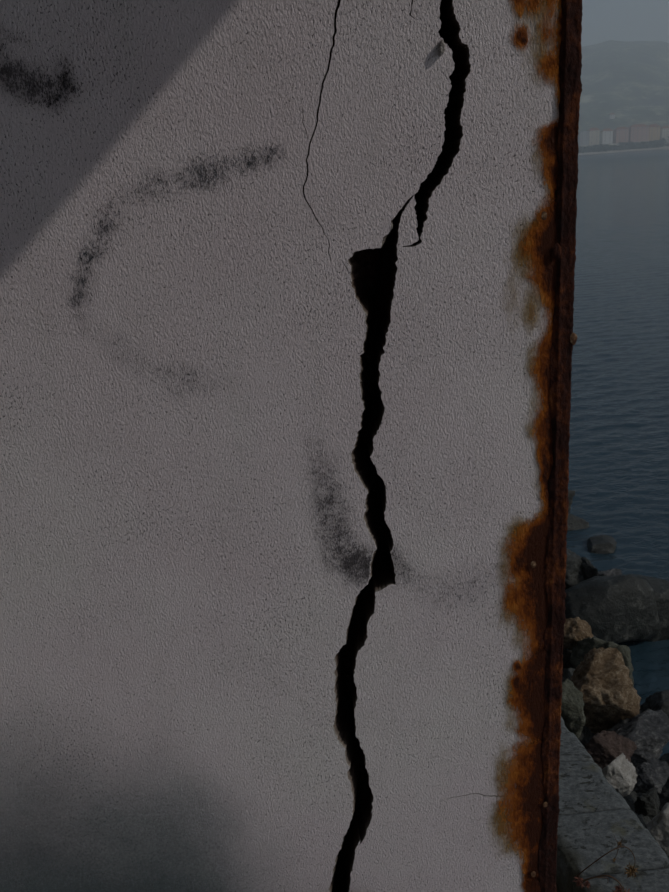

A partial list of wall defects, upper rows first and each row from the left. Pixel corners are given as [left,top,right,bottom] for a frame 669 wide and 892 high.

crack [302,0,348,271]
crack [329,0,471,892]
rust [493,0,563,892]